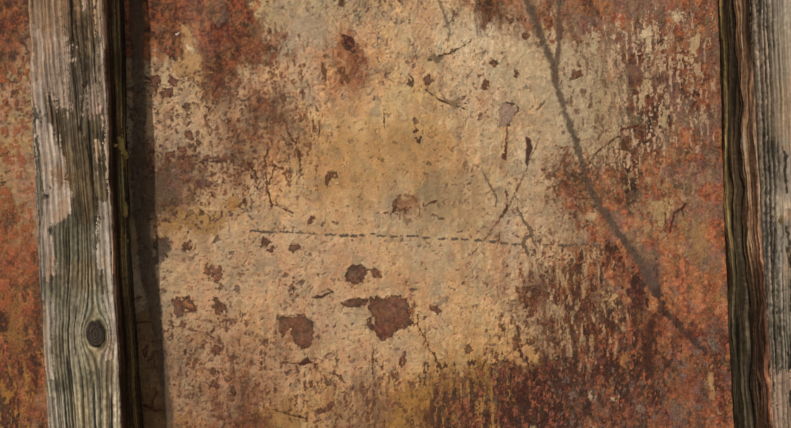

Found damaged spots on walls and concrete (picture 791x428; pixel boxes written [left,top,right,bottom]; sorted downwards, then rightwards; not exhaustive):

rust [0,0,47,428]
rust [142,0,734,428]
peeling [498,102,519,126]